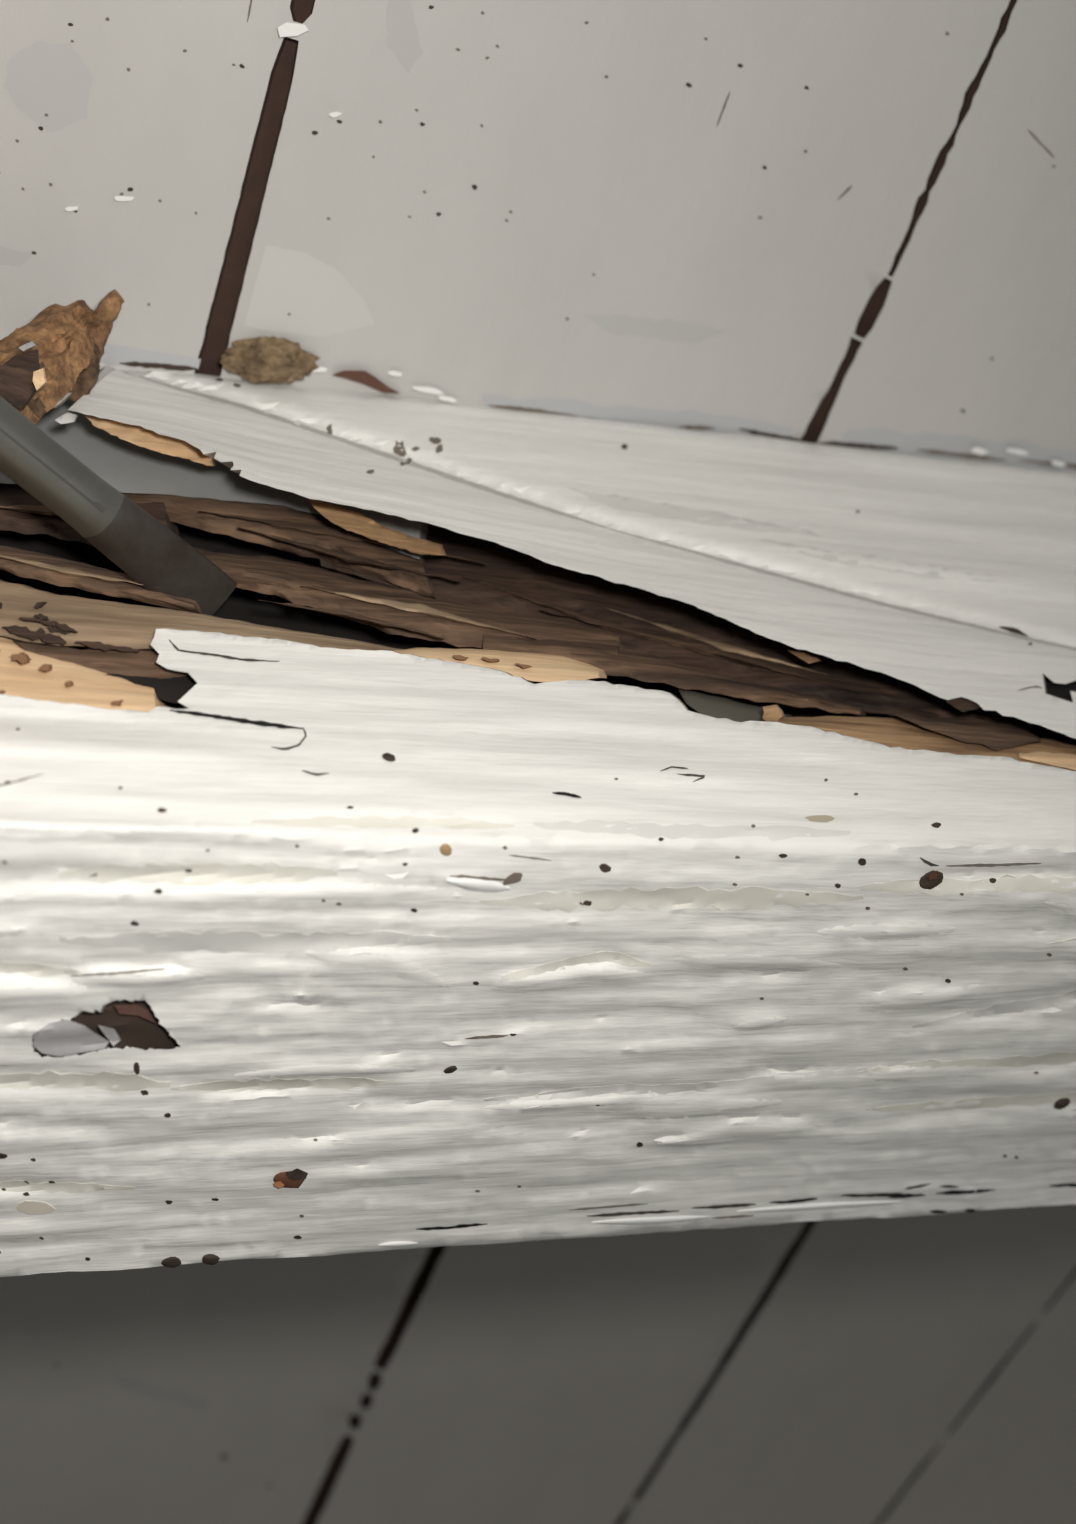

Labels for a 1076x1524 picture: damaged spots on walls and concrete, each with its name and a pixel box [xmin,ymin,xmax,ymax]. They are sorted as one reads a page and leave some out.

spalling [0,399,1076,771]
crack [169,639,280,662]
crack [170,710,329,776]
peeling [33,1000,181,1057]